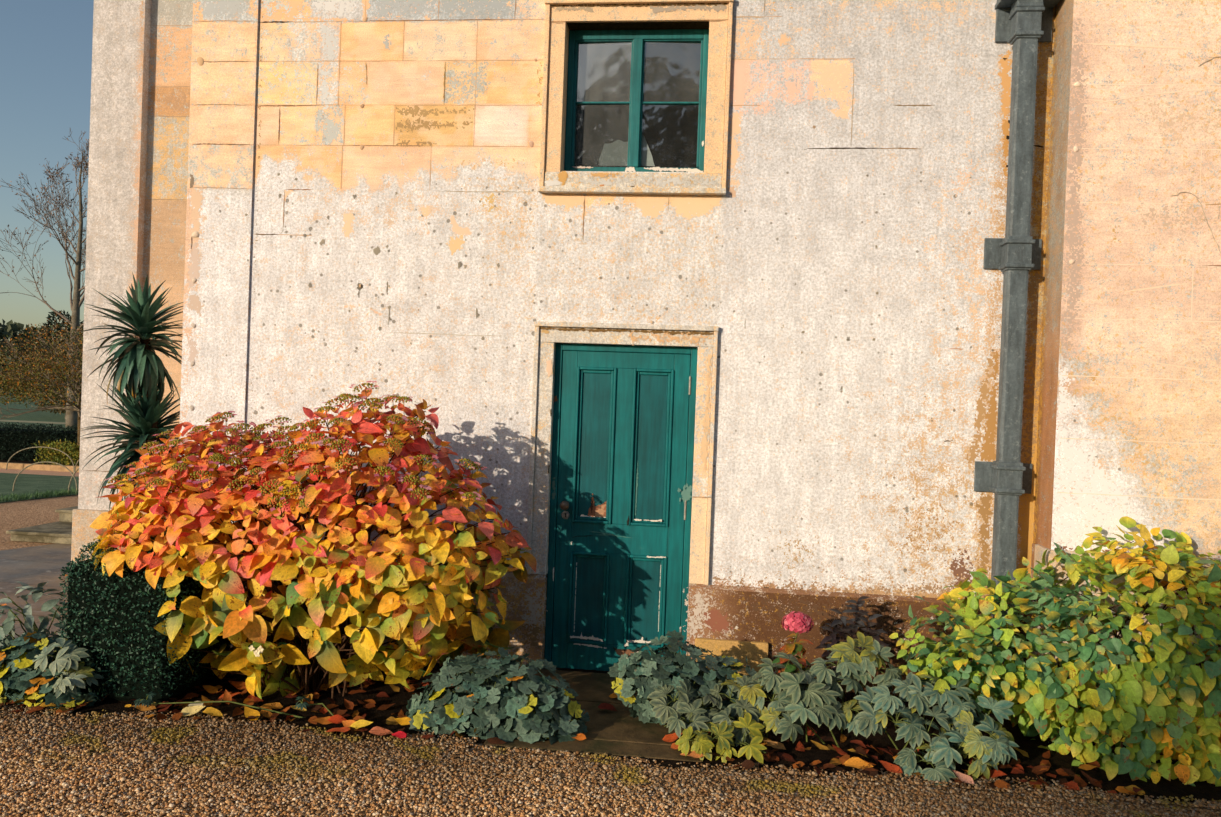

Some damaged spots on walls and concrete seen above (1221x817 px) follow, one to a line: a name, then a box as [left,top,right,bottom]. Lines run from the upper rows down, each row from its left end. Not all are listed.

peeling [260,0,371,23]
peeling [727,19,795,171]
peeling [187,174,210,317]
peeling [327,195,356,238]
peeling [625,166,736,220]
damp [713,549,974,656]